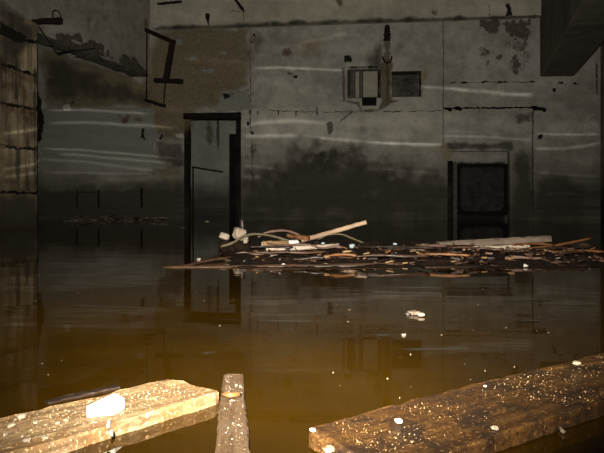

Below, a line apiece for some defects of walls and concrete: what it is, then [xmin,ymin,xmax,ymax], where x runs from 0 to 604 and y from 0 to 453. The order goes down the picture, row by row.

peeling [36,29,258,175]
water stain [245,148,447,219]
crack [269,22,546,214]
peeling [480,19,531,75]